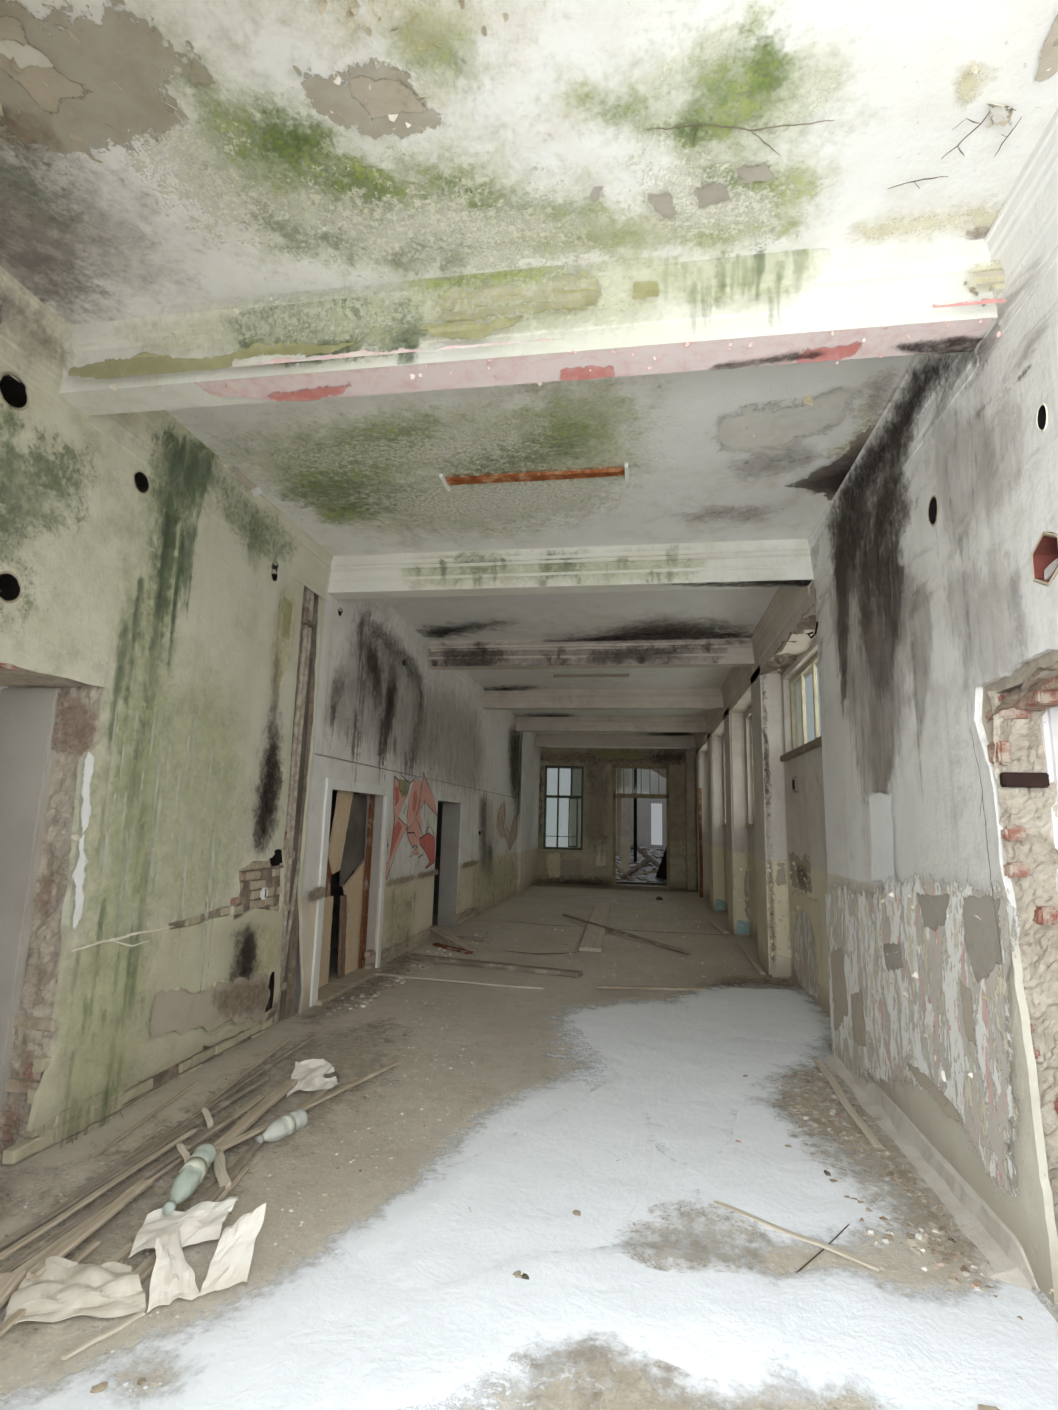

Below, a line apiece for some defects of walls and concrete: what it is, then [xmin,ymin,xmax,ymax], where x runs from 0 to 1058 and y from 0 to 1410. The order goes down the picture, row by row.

peeling [0,0,216,168]
peeling [292,57,443,140]
water stain [126,87,633,295]
water stain [628,45,813,256]
peeling [1035,16,1058,82]
water stain [231,296,425,363]
water stain [835,414,913,706]
water stain [253,592,293,850]
water stain [332,611,503,773]
flaking render [0,662,290,1164]
peeling [713,846,750,935]
peeling [767,661,1058,1236]